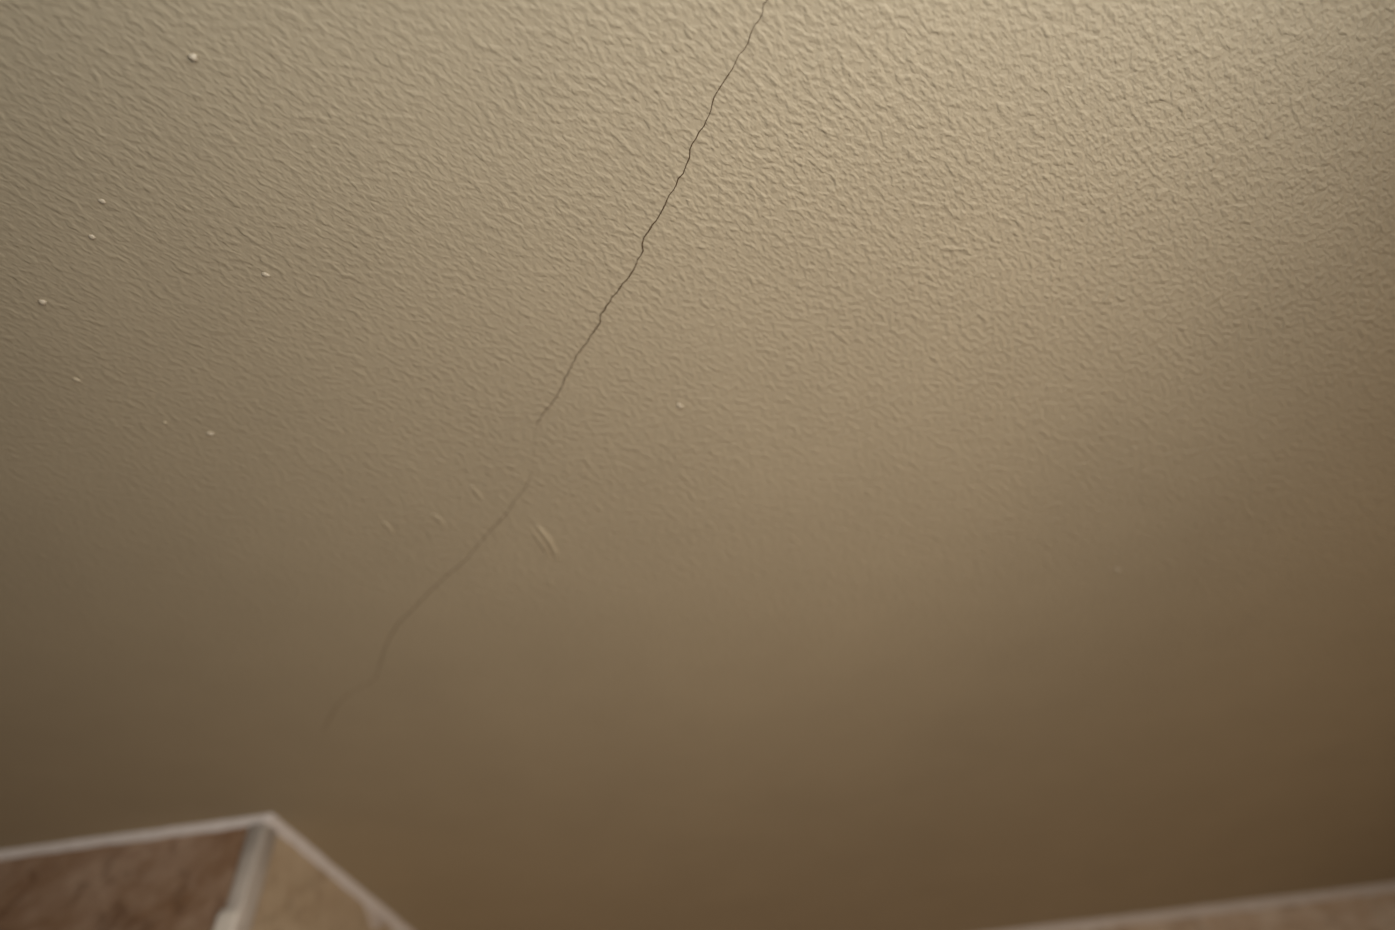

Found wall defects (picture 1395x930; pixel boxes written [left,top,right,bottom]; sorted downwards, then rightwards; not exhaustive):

crack [322,0,767,733]